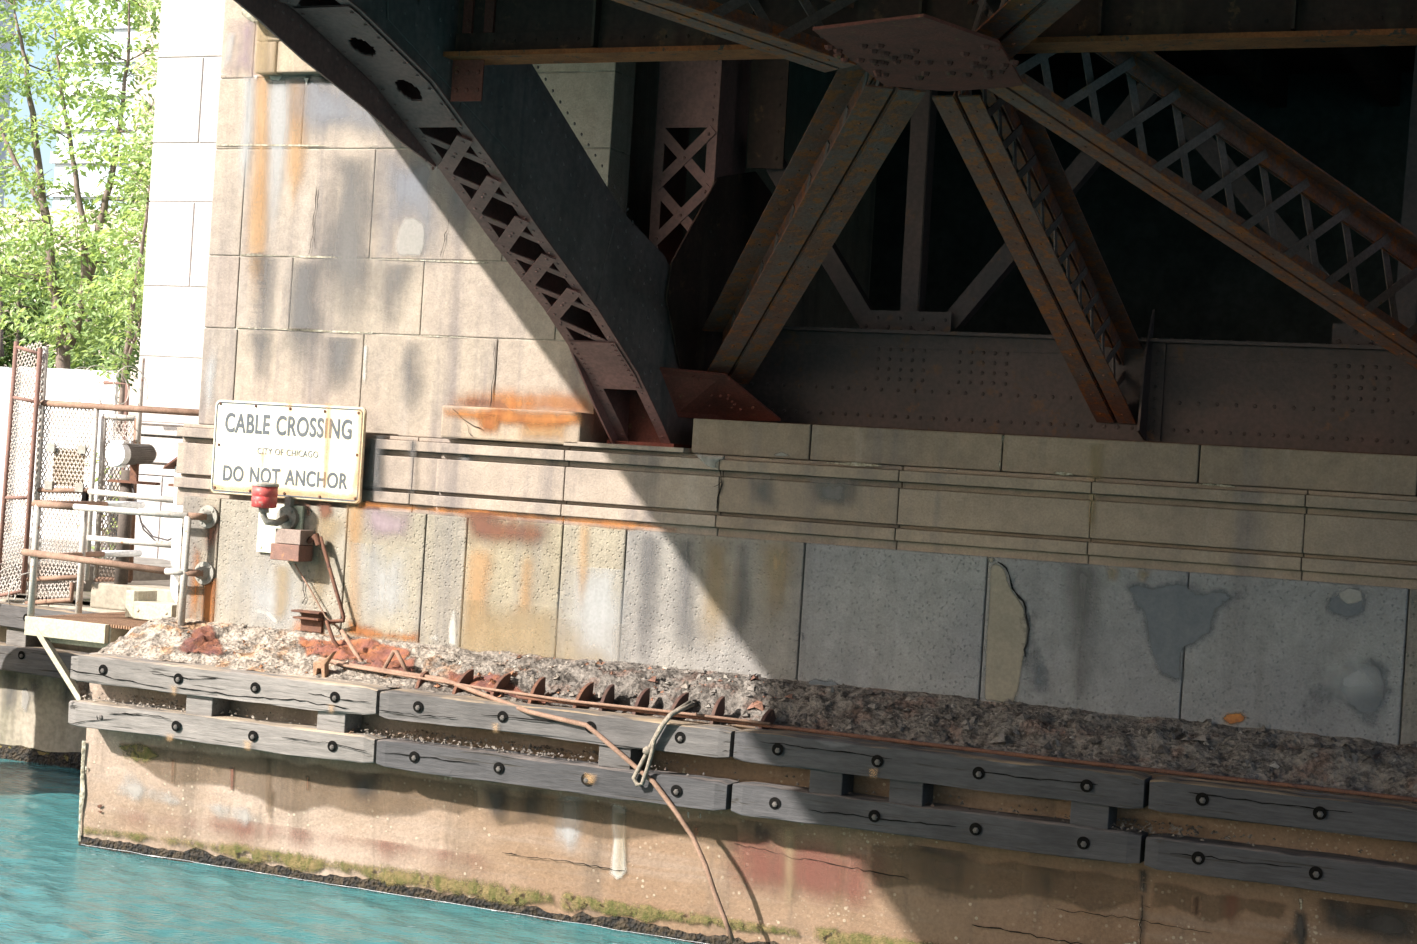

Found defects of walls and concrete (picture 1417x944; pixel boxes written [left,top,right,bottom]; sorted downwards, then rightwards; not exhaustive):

rust [251,22,269,253]
rust [289,85,304,184]
rust [450,394,587,435]
rust [435,509,540,540]
rust [557,519,654,532]
spalling [77,681,89,700]
rust [293,620,415,672]
damp [642,539,653,623]
damp [680,543,690,635]
spalling [97,558,1417,803]
damp [1128,583,1234,680]
damp [1327,589,1365,617]